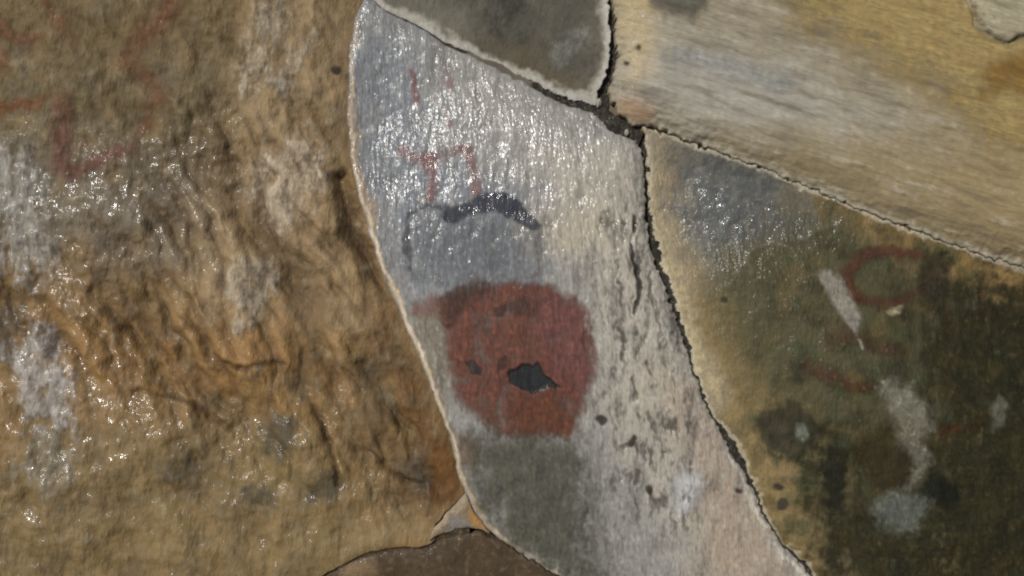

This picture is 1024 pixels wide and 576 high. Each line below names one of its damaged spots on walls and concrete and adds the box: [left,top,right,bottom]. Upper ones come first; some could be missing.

crack [386,11,467,54]
crack [969,2,1024,43]
damp [349,18,606,576]
crack [531,0,1011,576]
damp [757,252,1024,576]